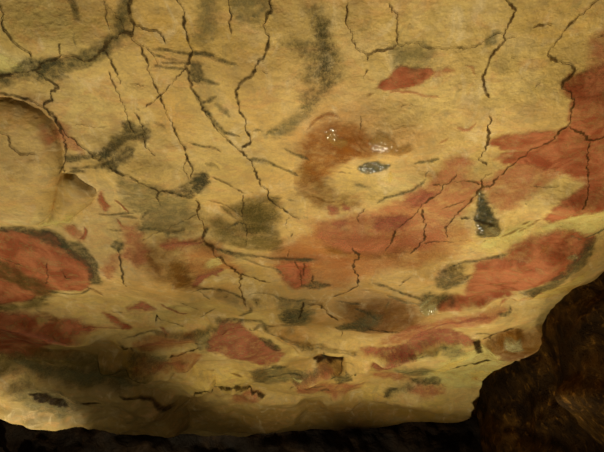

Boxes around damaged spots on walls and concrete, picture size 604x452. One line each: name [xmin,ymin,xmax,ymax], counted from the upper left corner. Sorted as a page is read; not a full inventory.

crack [0,0,295,306]
crack [298,248,360,334]
water stain [98,44,604,397]
crack [345,0,517,98]
crack [386,1,604,253]